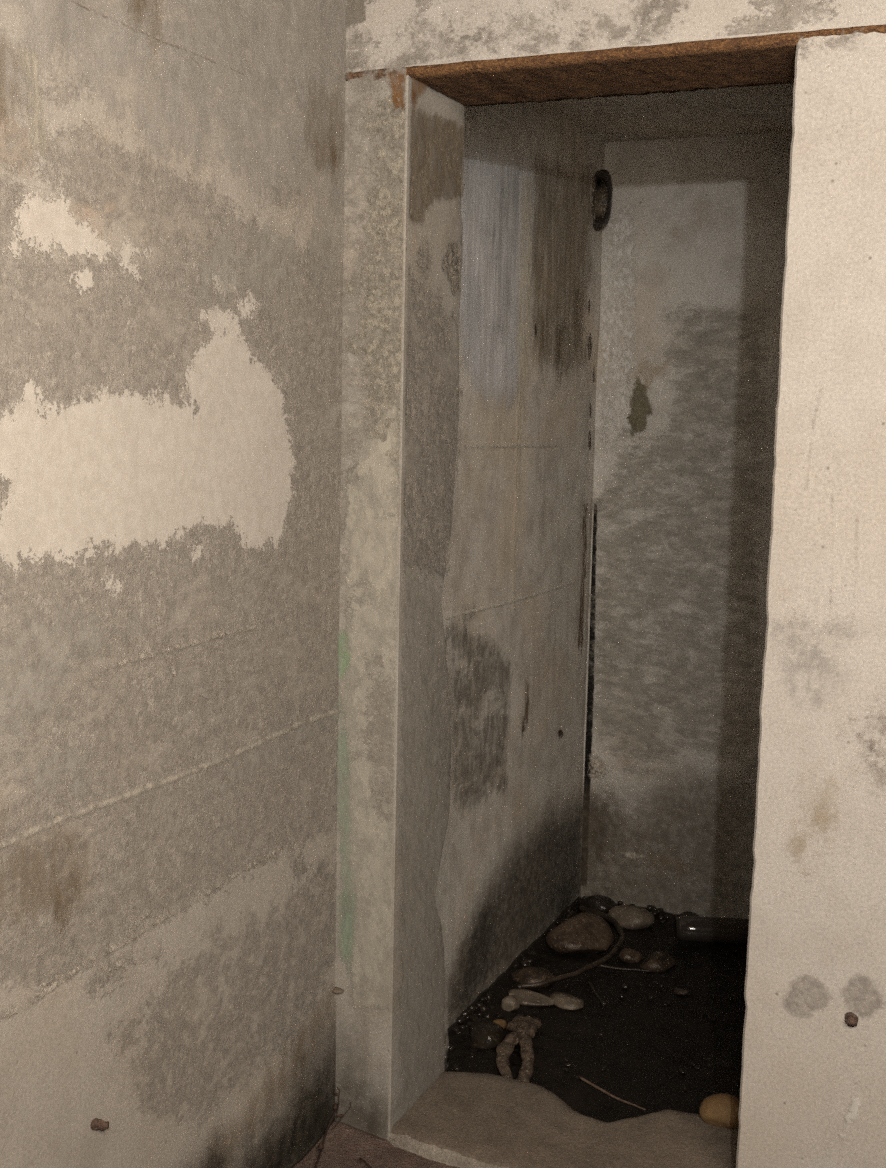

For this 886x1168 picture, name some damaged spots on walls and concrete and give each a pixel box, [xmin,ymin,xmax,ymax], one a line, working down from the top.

peeling [402,0,559,65]
peeling [571,0,688,50]
peeling [0,83,469,998]
peeling [446,617,510,804]
water stain [247,1053,336,1168]